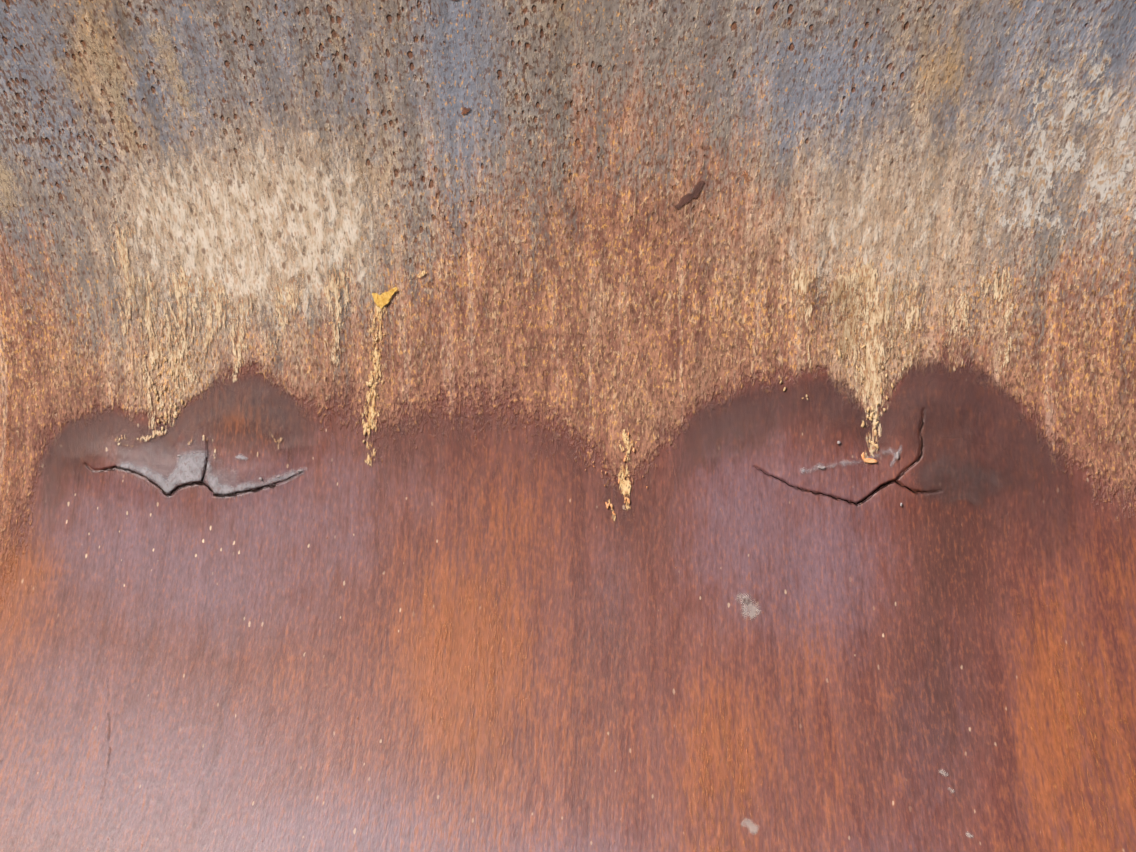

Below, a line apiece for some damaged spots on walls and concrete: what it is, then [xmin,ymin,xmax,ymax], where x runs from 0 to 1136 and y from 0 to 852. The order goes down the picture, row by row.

corrosion [362,300,387,467]
crack [85,442,299,496]
corrosion [585,429,635,521]
crack [755,415,938,505]